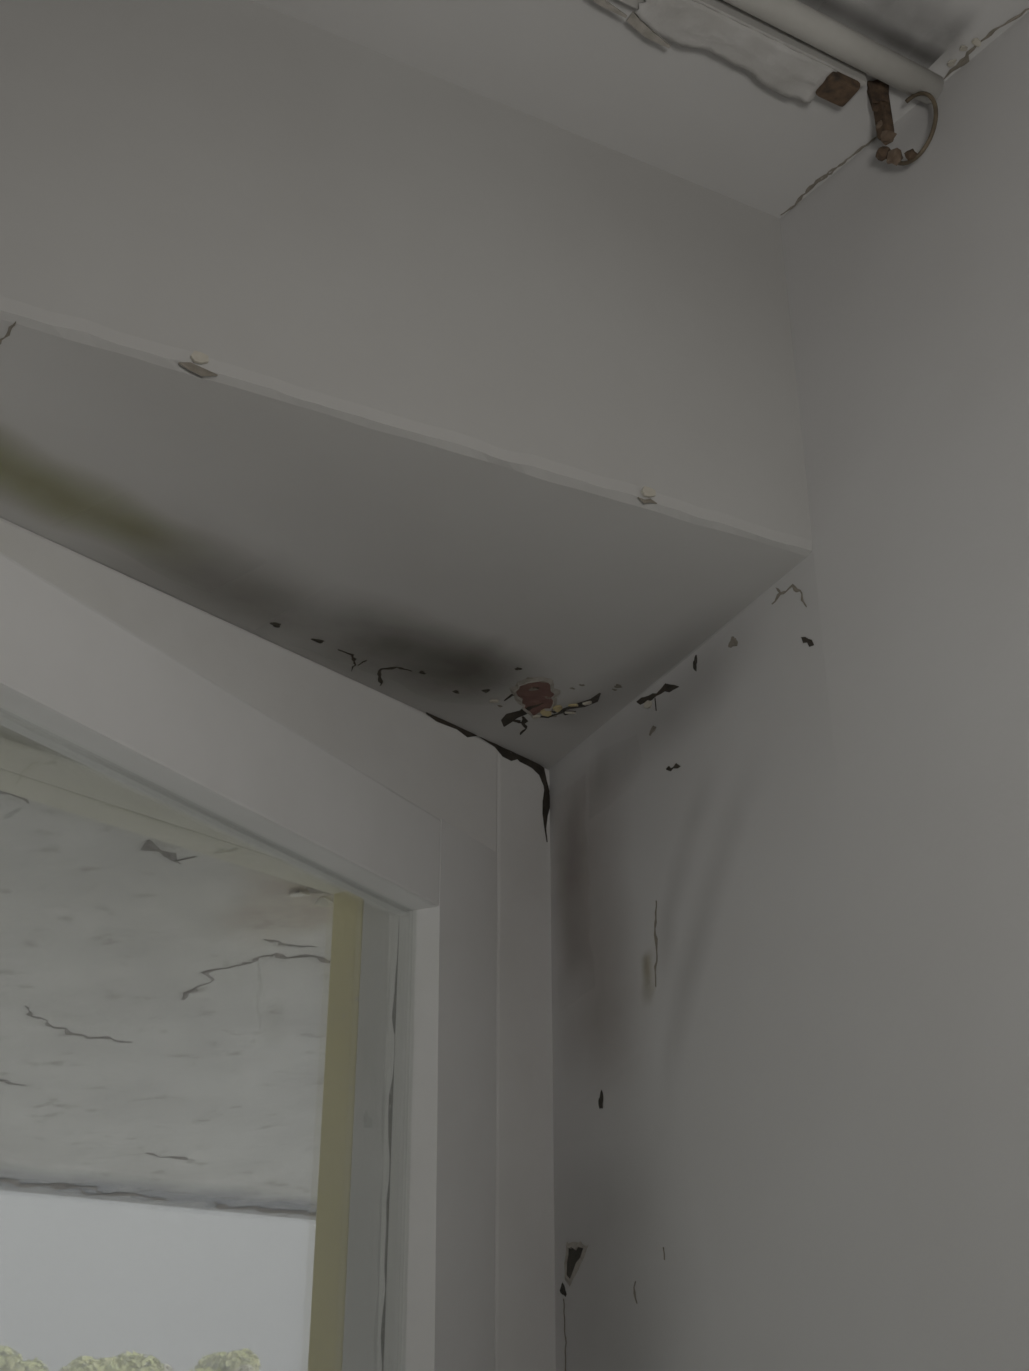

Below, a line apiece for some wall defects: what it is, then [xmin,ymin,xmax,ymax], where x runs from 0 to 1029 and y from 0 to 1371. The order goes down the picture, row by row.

crack [0,321,16,345]
flaking render [489,667,592,735]
crack [540,693,601,718]
crack [636,683,679,711]
crack [426,712,550,842]
flaking render [560,1241,589,1297]